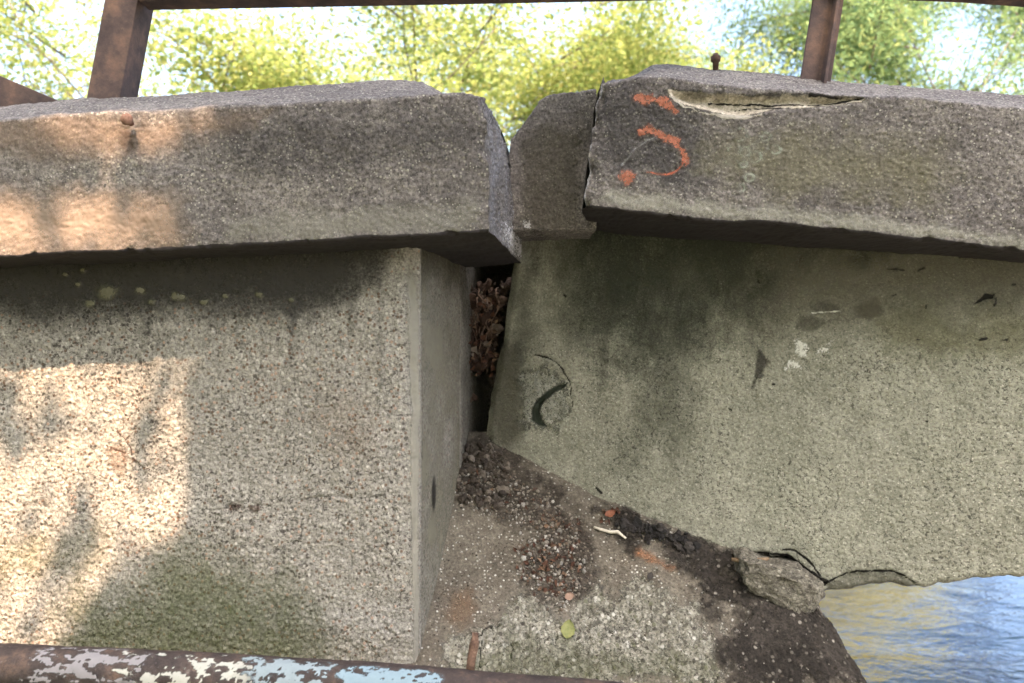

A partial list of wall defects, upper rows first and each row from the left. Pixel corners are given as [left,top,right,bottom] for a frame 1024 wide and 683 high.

spalling [668,89,866,120]
damp [556,230,772,369]
crack [758,548,917,586]